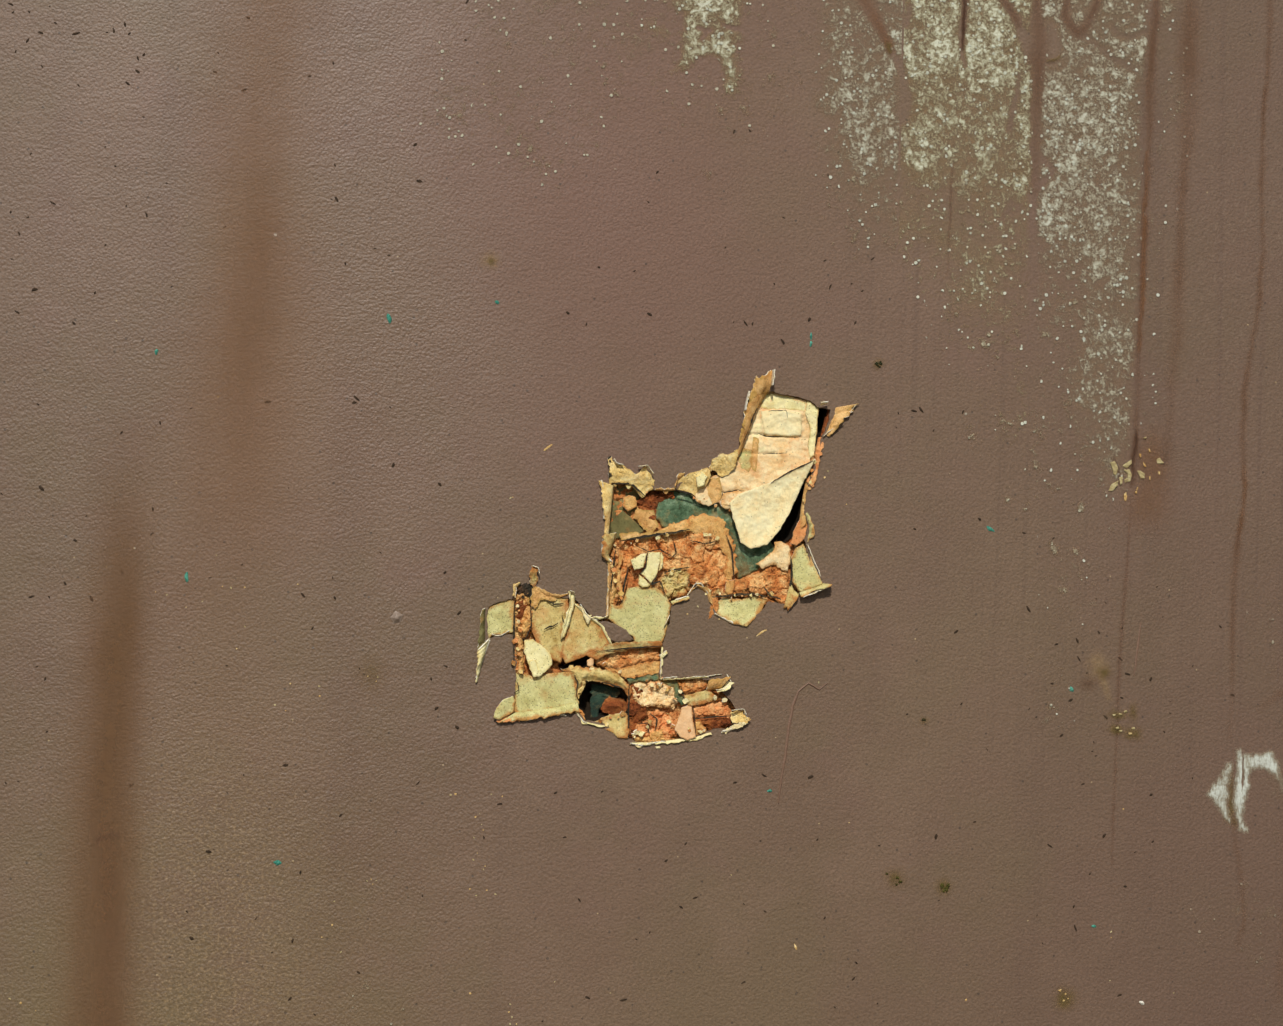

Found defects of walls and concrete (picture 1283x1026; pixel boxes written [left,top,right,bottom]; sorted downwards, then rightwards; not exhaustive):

water stain [419,41,616,186]
water stain [535,0,775,130]
water stain [813,0,1192,503]
peeling [475,369,857,749]